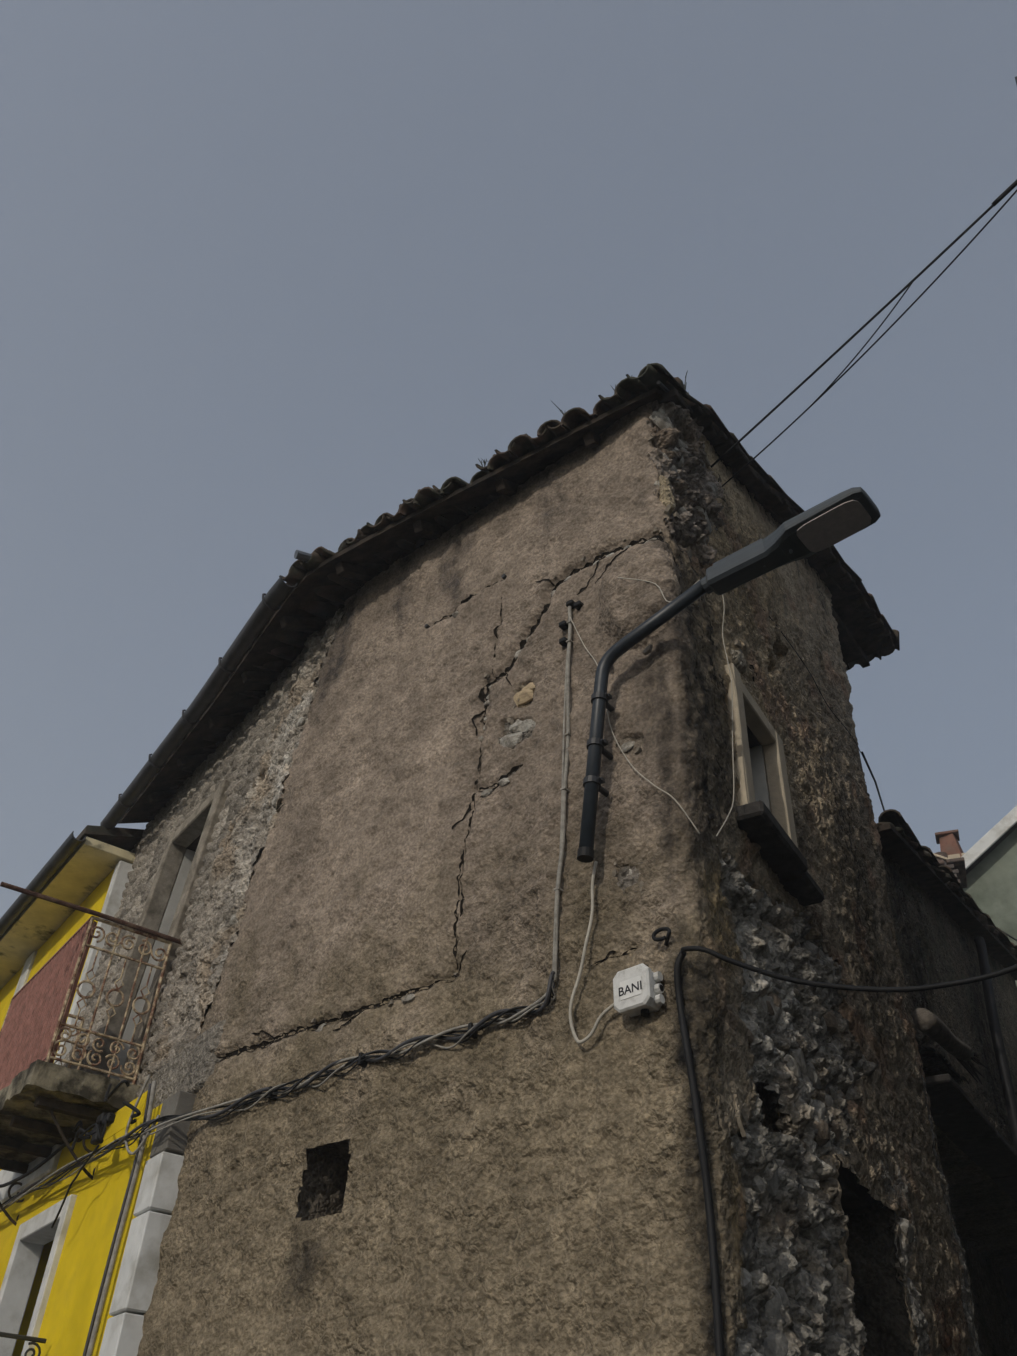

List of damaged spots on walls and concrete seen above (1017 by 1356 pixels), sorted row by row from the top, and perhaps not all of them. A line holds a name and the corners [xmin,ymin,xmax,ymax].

flaking render [646,400,726,566]
flaking render [142,611,345,1088]
crack [217,528,664,1062]
flaking render [716,844,878,1356]
spalling [887,1199,930,1356]